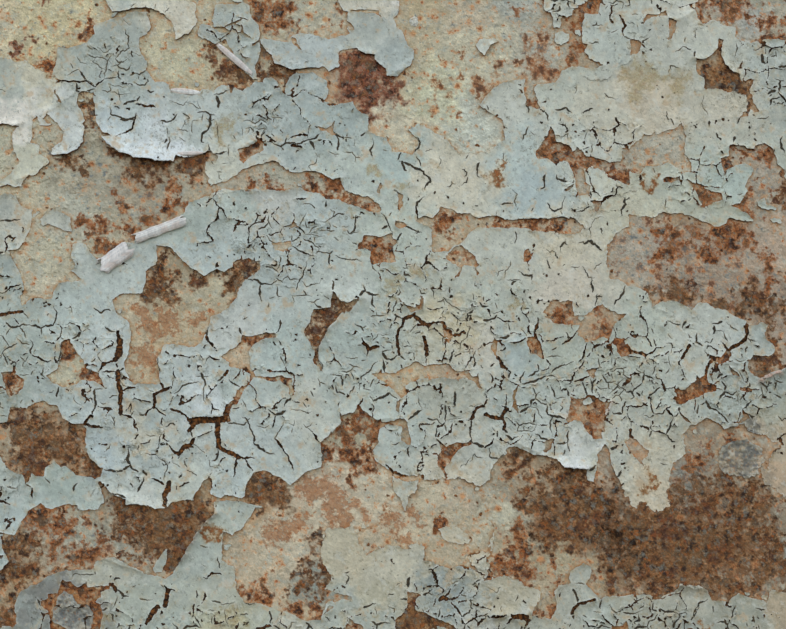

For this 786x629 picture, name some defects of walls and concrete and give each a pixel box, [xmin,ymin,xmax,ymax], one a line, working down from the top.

crack [57,4,504,245]
rust [334,48,408,121]
crack [0,174,786,505]
rust [642,215,786,378]
rust [0,406,101,482]
peeling [0,344,223,570]
rust [0,495,223,629]
crack [72,545,330,629]
peeling [0,500,786,629]
peeling [392,476,418,511]
crack [363,577,528,629]
rust [484,438,786,619]